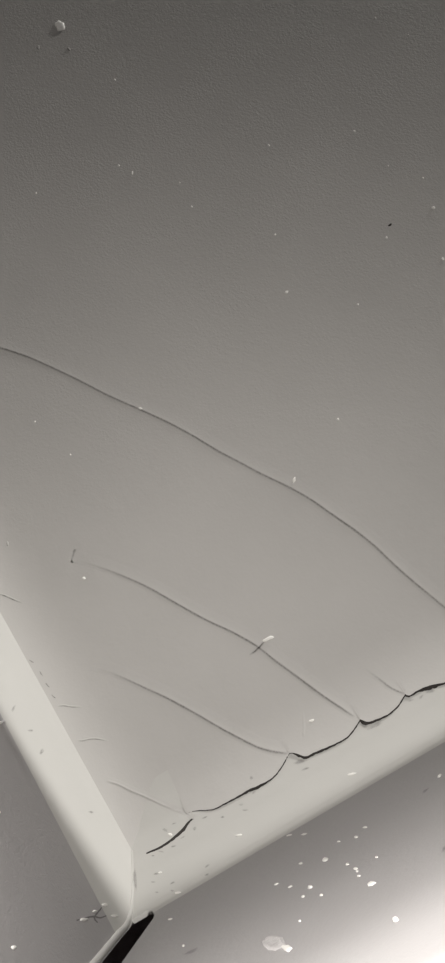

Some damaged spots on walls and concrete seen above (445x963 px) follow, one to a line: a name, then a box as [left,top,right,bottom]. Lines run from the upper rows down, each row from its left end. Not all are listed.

crack [0,337,445,854]